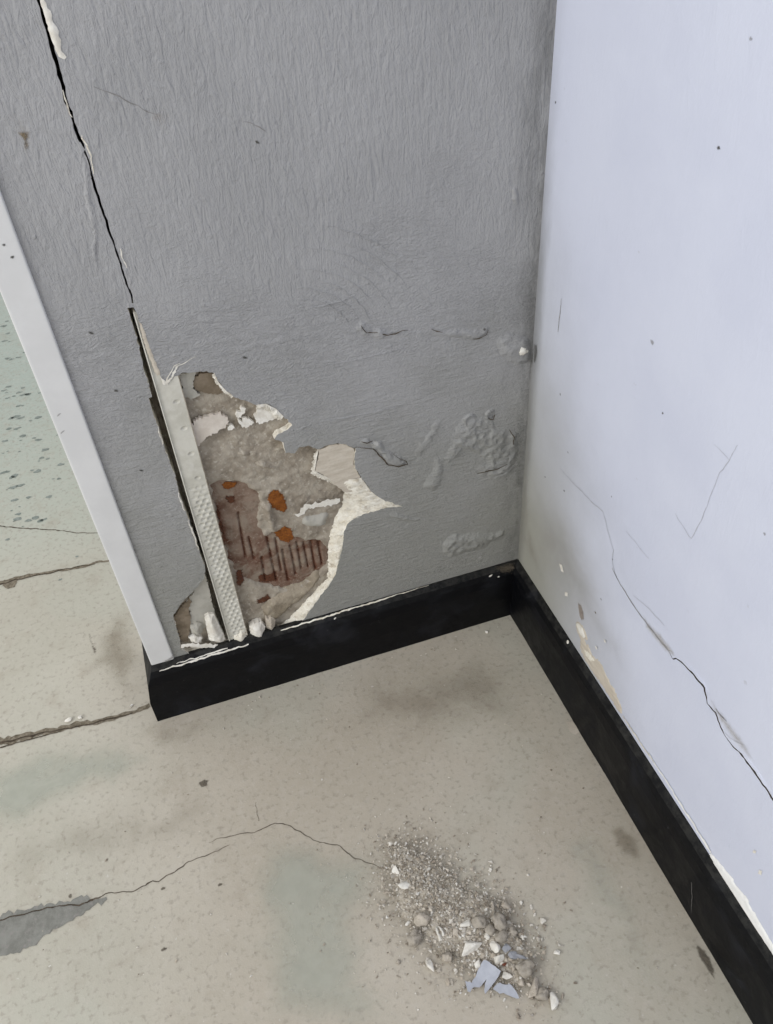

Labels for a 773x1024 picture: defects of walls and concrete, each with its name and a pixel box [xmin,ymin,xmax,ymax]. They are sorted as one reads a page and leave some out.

crack [37,0,133,299]
crack [0,712,133,748]
crack [93,803,388,900]
flaking render [129,308,429,672]
crack [563,472,773,800]
crack [679,446,737,537]